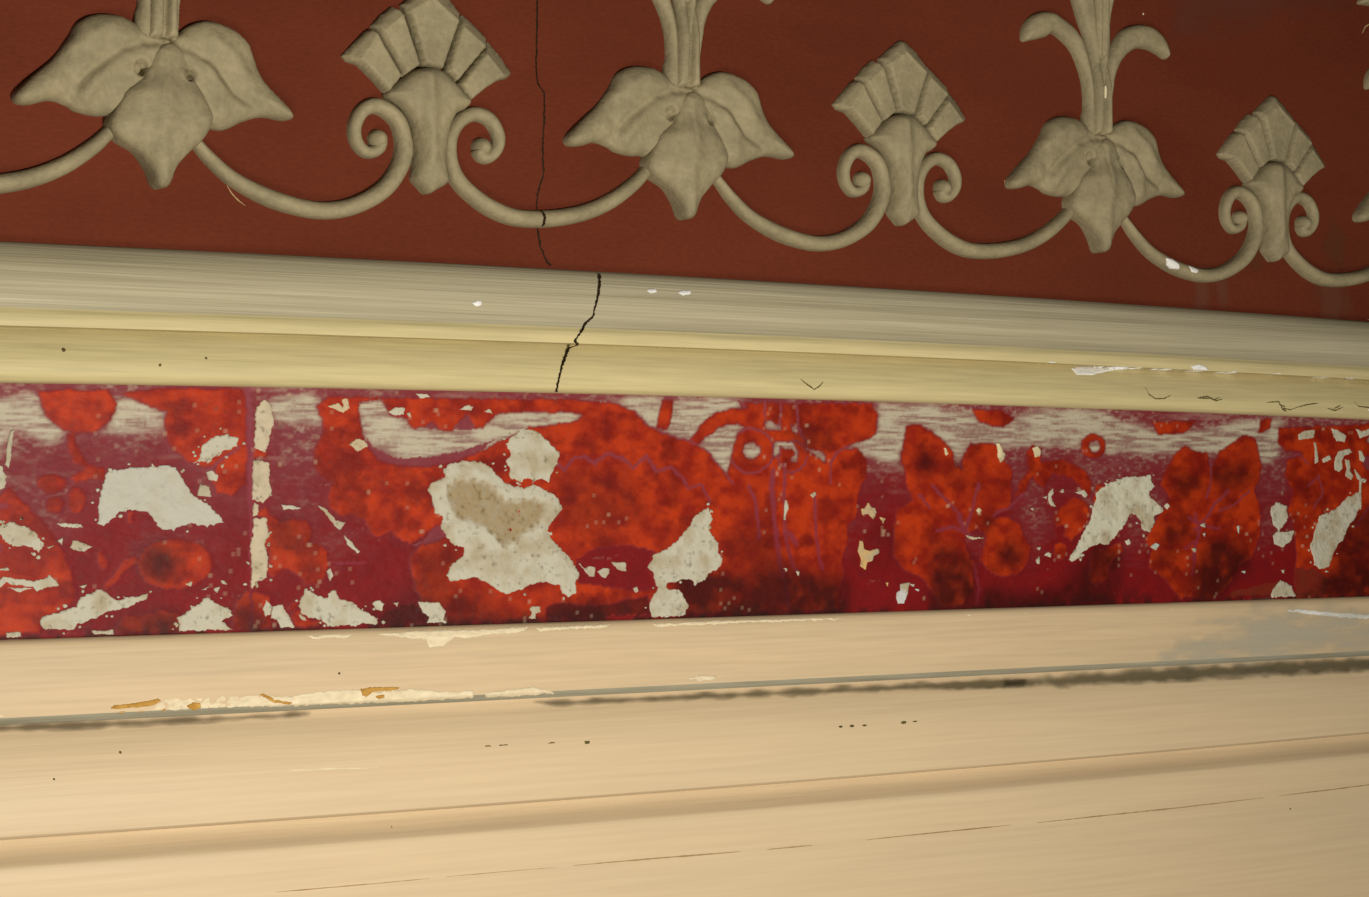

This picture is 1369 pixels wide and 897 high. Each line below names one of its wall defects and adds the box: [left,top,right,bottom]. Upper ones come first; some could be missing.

crack [535,0,551,266]
crack [556,273,602,392]
peeling [0,398,626,648]
peeling [633,503,841,627]
peeling [858,540,880,570]
peeling [861,503,885,523]
peeling [886,582,919,604]
peeling [1031,474,1170,562]
peeling [1270,502,1294,547]
peeling [1271,569,1296,598]
peeling [1298,428,1369,572]
peeling [152,687,555,711]